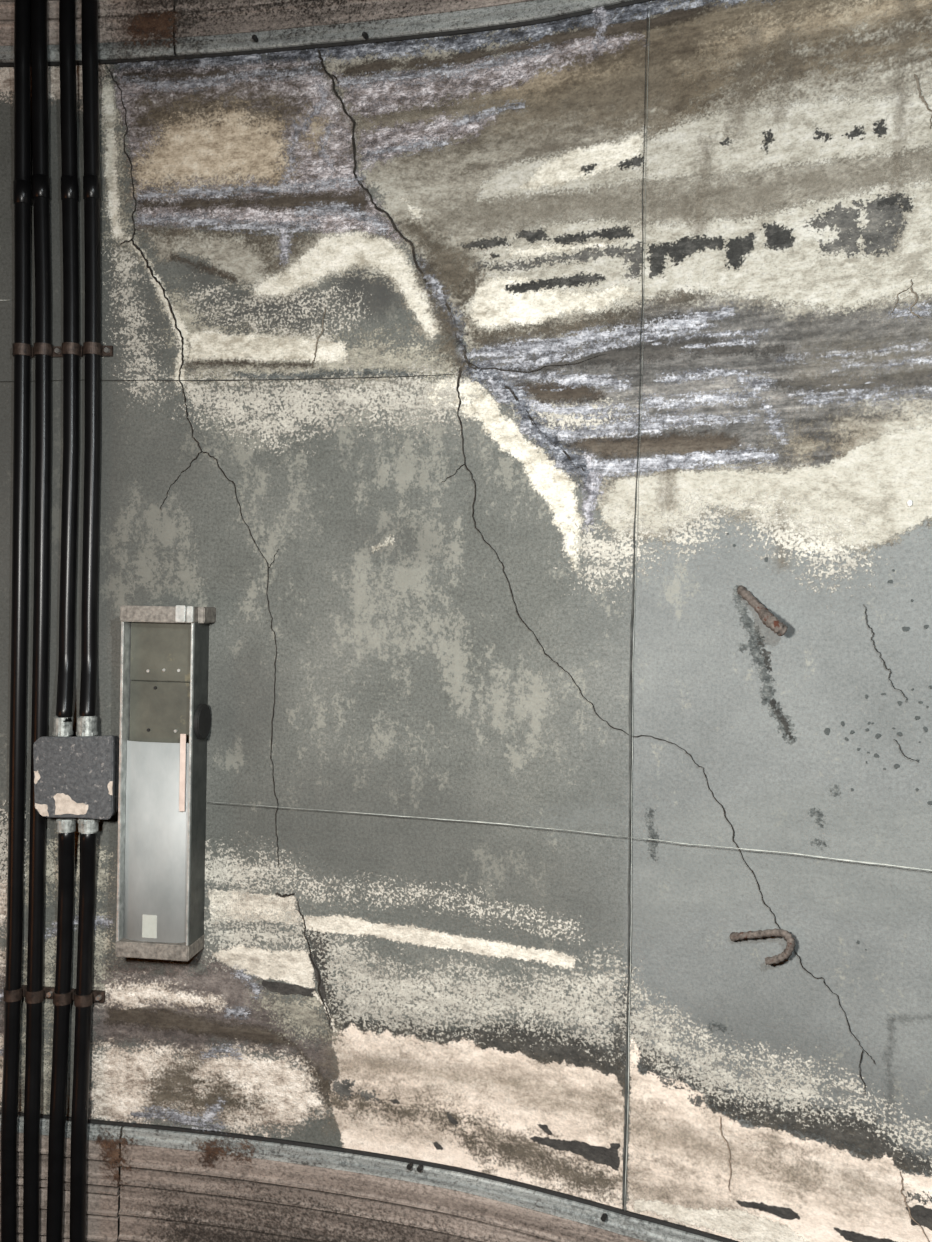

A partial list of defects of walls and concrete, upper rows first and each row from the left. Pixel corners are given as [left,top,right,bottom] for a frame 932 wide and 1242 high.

damp [0,67,14,104]
damp [48,66,60,105]
damp [99,0,932,612]
crack [104,63,333,1031]
crack [318,50,875,1091]
crack [863,604,907,701]
damp [45,821,58,907]
damp [18,936,28,1113]
damp [40,920,57,1115]
damp [89,831,932,1177]